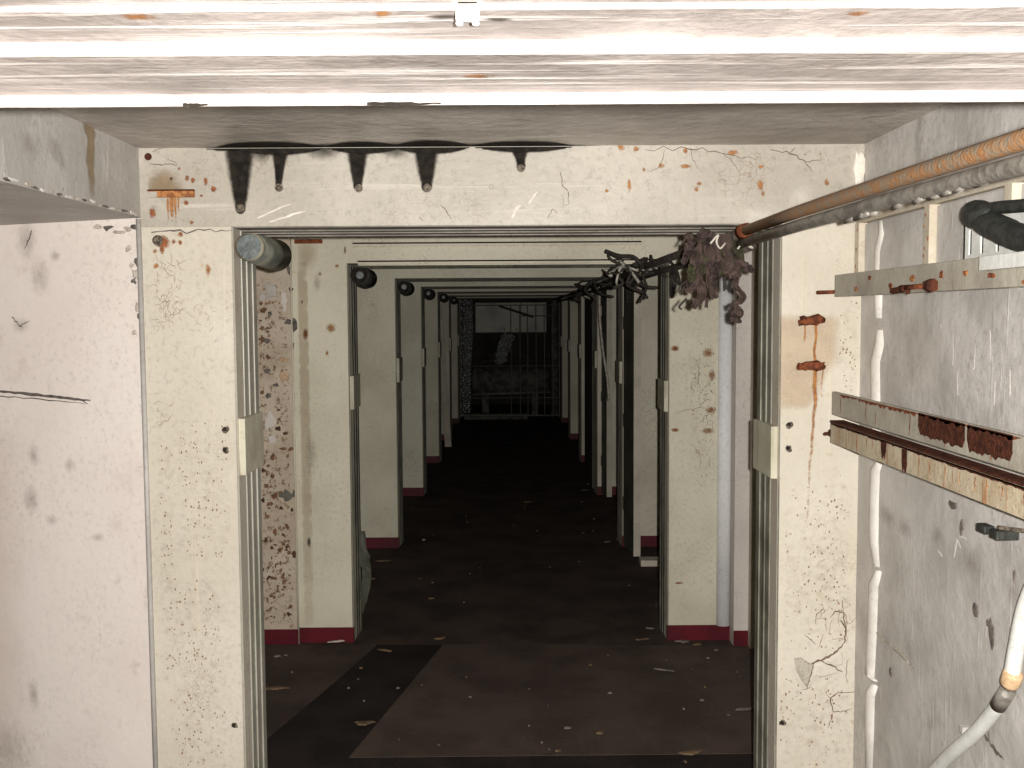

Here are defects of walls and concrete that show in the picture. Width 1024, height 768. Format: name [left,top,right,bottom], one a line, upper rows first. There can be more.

water stain [84,124,95,185]
crack [645,146,816,172]
rust [150,197,188,217]
crack [151,229,231,332]
crack [0,390,90,404]
peeling [257,266,297,622]
rust [797,315,825,466]
rust [831,424,1024,505]
rust [840,395,1020,461]
spalling [794,650,843,687]
crack [802,599,856,727]